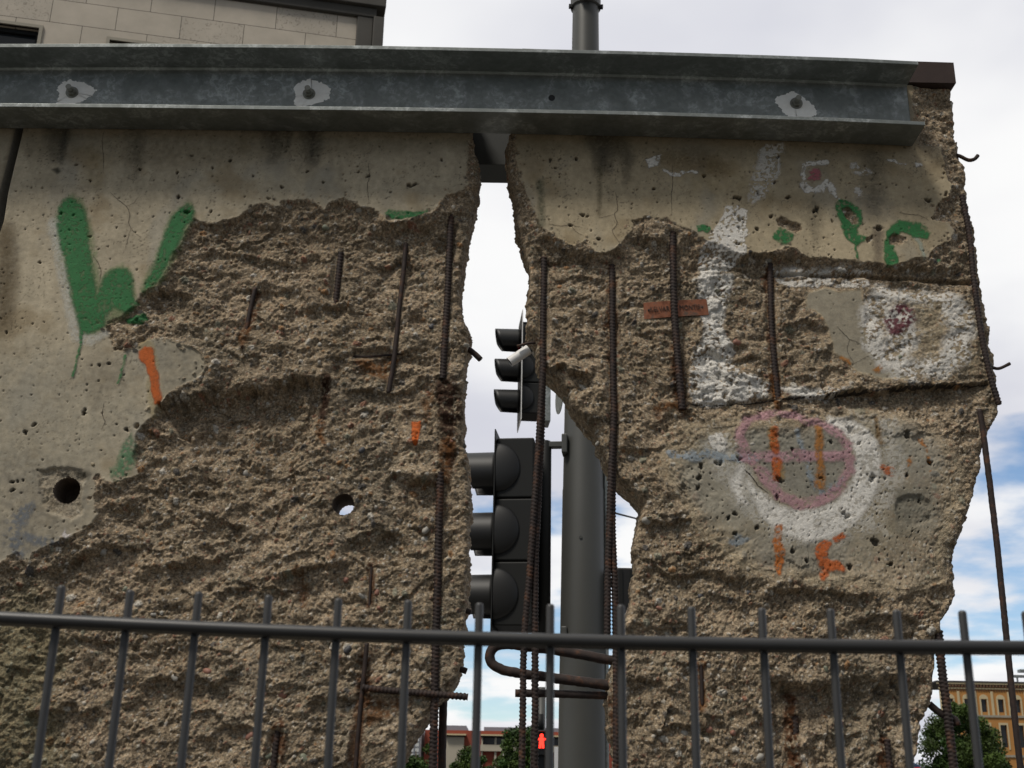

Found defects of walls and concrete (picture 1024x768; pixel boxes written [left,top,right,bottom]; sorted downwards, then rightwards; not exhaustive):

spalling [0,135,482,631]
corrosion [318,373,330,443]
corrosion [436,378,463,480]
spalling [505,85,999,640]
spalling [0,626,465,768]
spalling [603,653,613,768]
spalling [626,650,935,768]
corrosion [784,694,800,768]